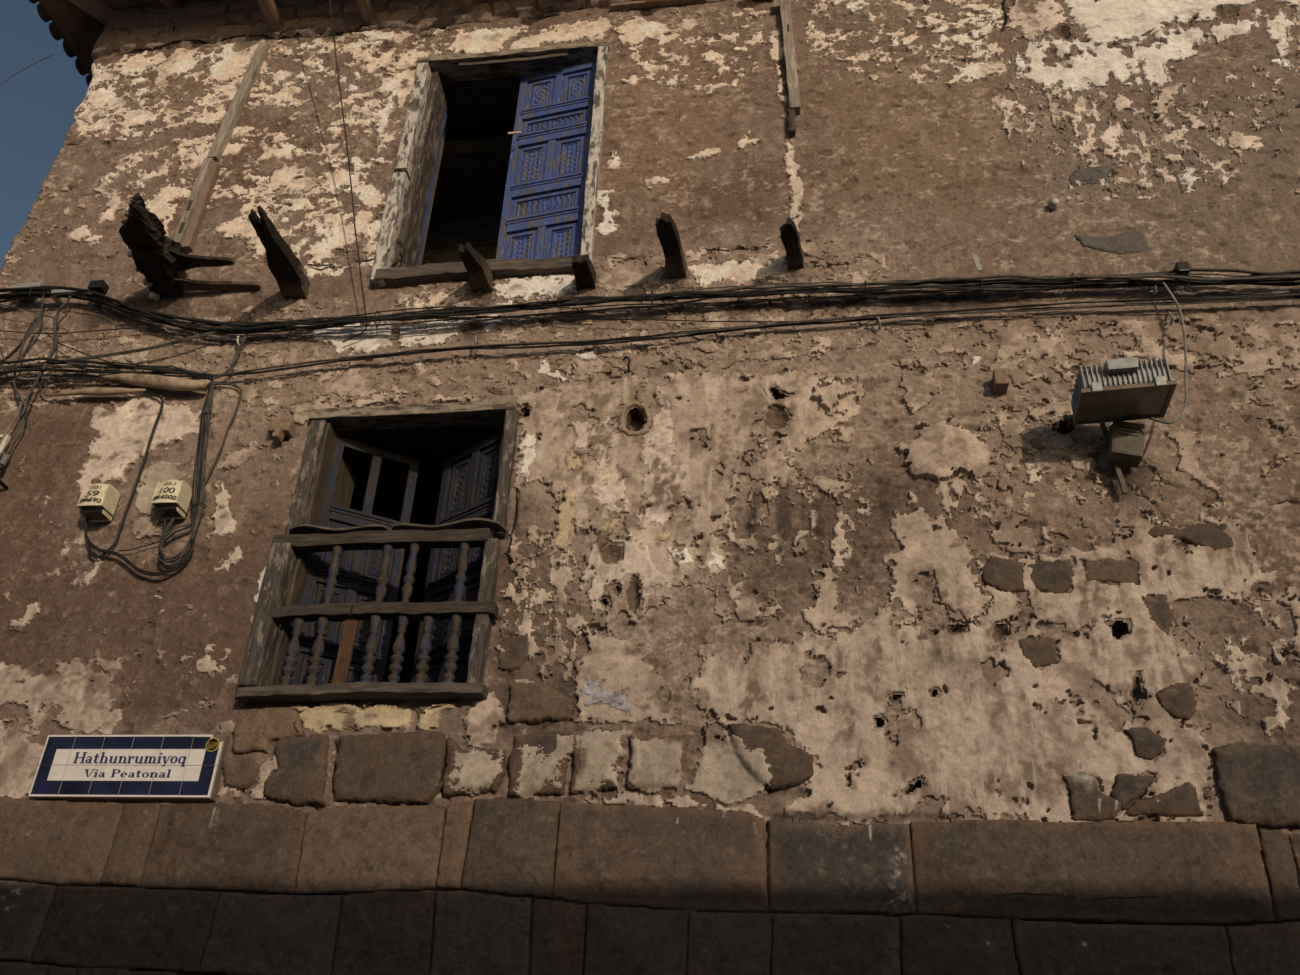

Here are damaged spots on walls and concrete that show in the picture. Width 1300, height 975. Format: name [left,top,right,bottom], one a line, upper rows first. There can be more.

flaking render [0,6,789,309]
flaking render [0,139,1300,826]